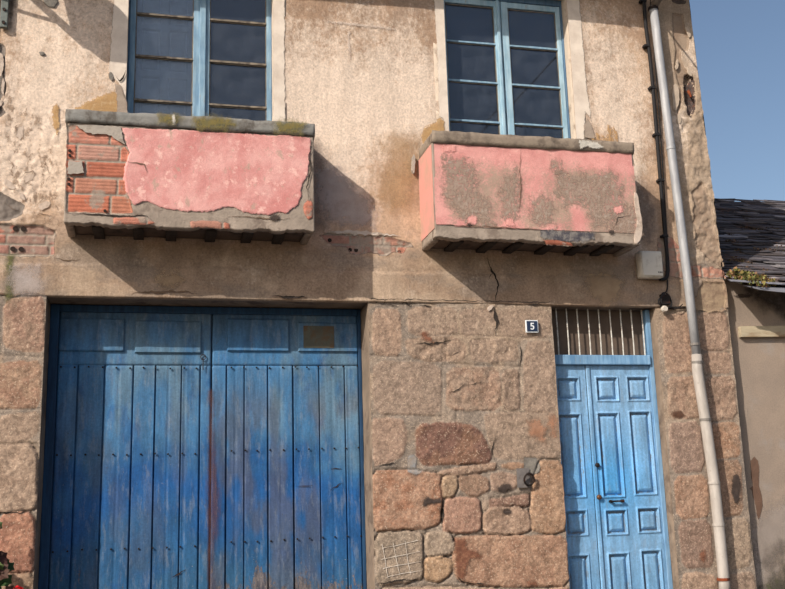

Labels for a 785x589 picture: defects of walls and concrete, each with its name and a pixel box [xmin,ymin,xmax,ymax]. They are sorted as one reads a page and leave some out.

flaking render [672,0,696,124]
spalling [0,43,154,257]
peeling [591,125,618,141]
spalling [190,220,230,229]
spalling [303,200,313,219]
spalling [320,230,414,256]
peeling [441,156,642,234]
crack [371,261,548,334]
damp [751,505,785,589]